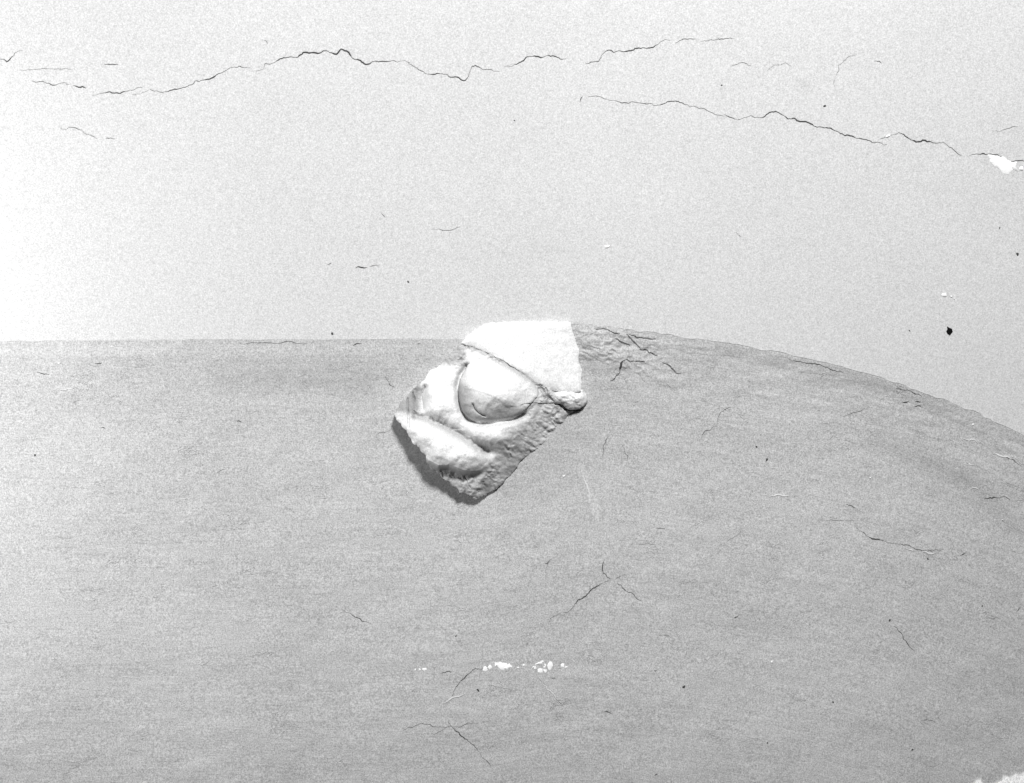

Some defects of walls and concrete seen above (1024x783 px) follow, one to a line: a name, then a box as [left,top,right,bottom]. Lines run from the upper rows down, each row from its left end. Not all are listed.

crack [5,49,560,94]
crack [586,38,727,64]
crack [580,96,1023,162]
spalling [988,154,1024,174]
crack [549,559,641,622]